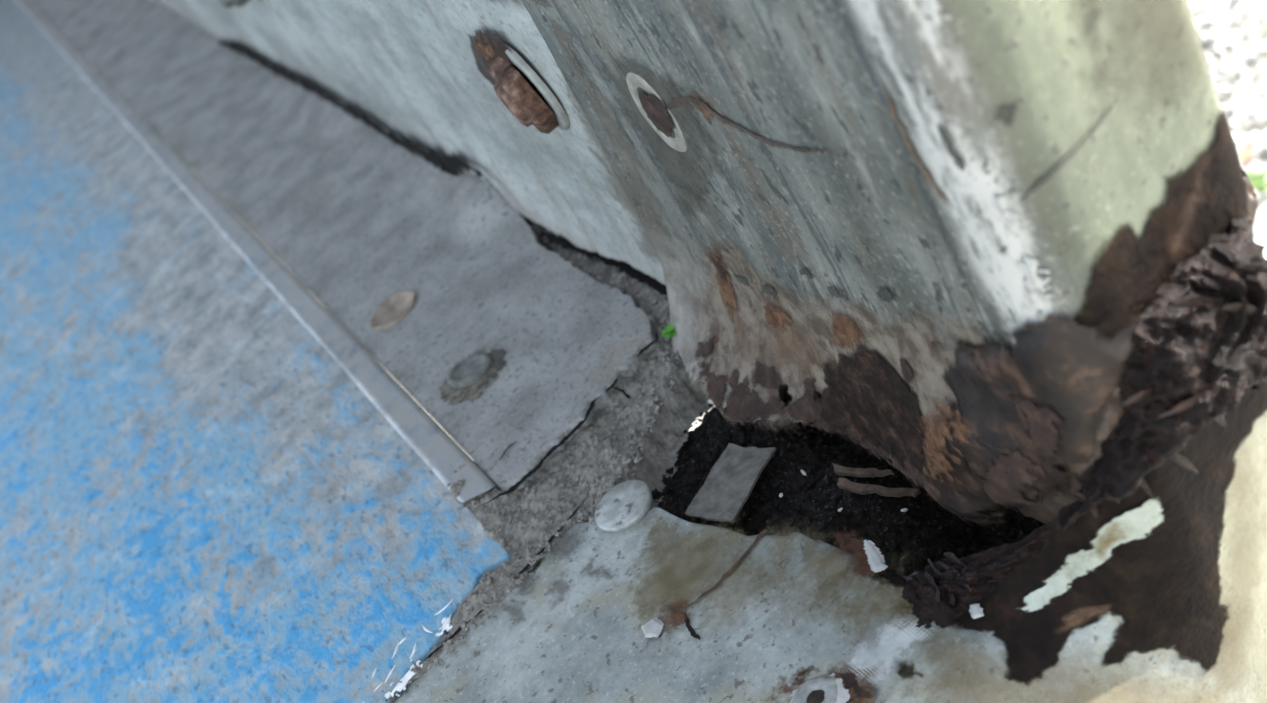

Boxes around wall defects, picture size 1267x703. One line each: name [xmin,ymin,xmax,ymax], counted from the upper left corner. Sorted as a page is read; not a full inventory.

corrosion [467,29,522,86]
peeling [1015,252,1052,299]
peeling [1232,258,1267,275]
peeling [1219,303,1261,316]
corrosion [690,243,985,494]
peeling [1157,392,1219,419]
peeling [1171,452,1199,474]
peeling [1022,479,1164,612]
peeling [924,552,972,607]
corrosion [771,666,877,703]